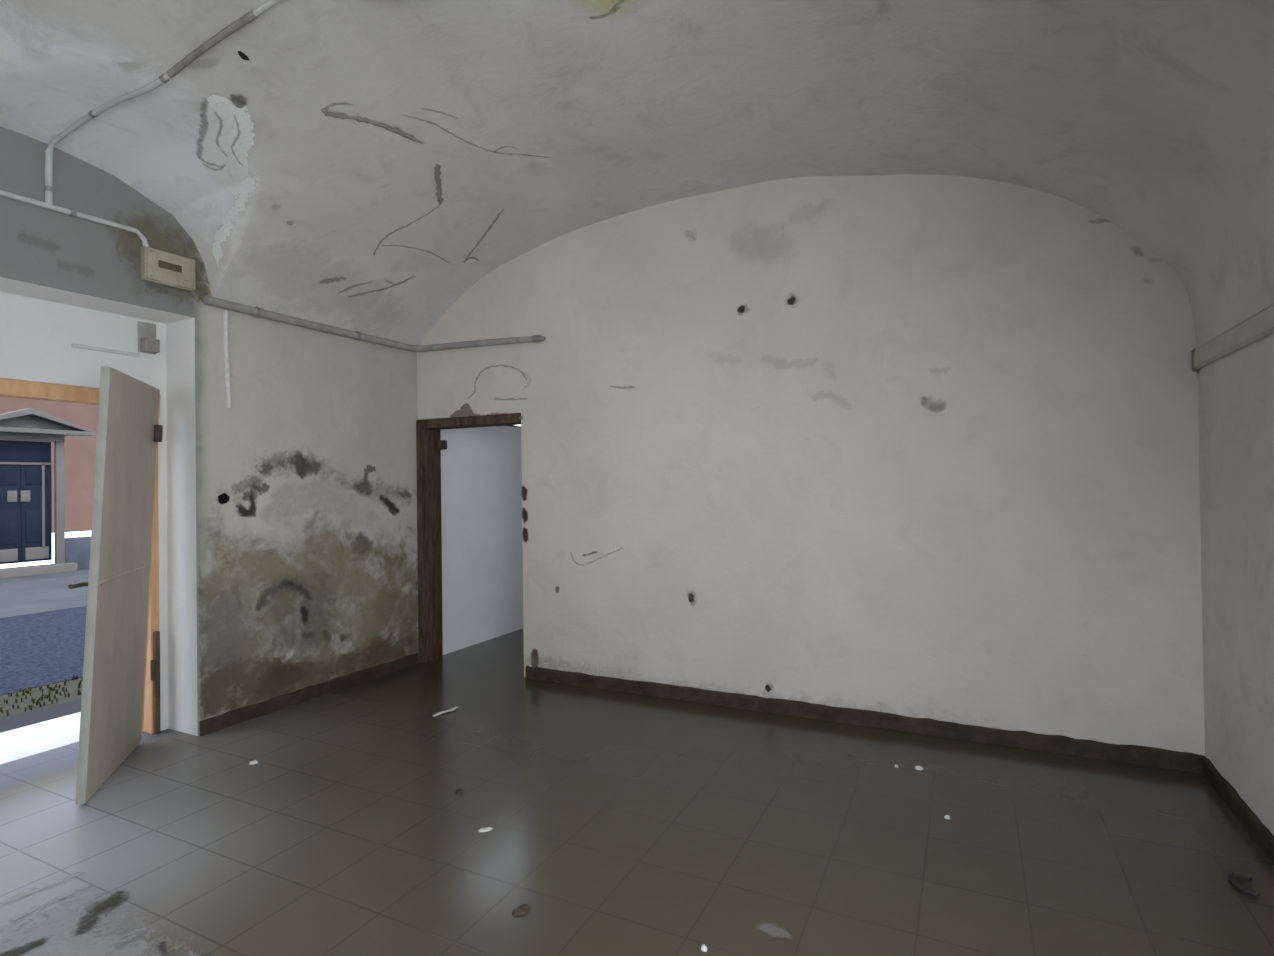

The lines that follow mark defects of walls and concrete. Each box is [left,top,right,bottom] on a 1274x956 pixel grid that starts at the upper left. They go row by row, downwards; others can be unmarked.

mould [237,454,320,517]
mould [355,465,410,514]
leakage [201,525,419,716]